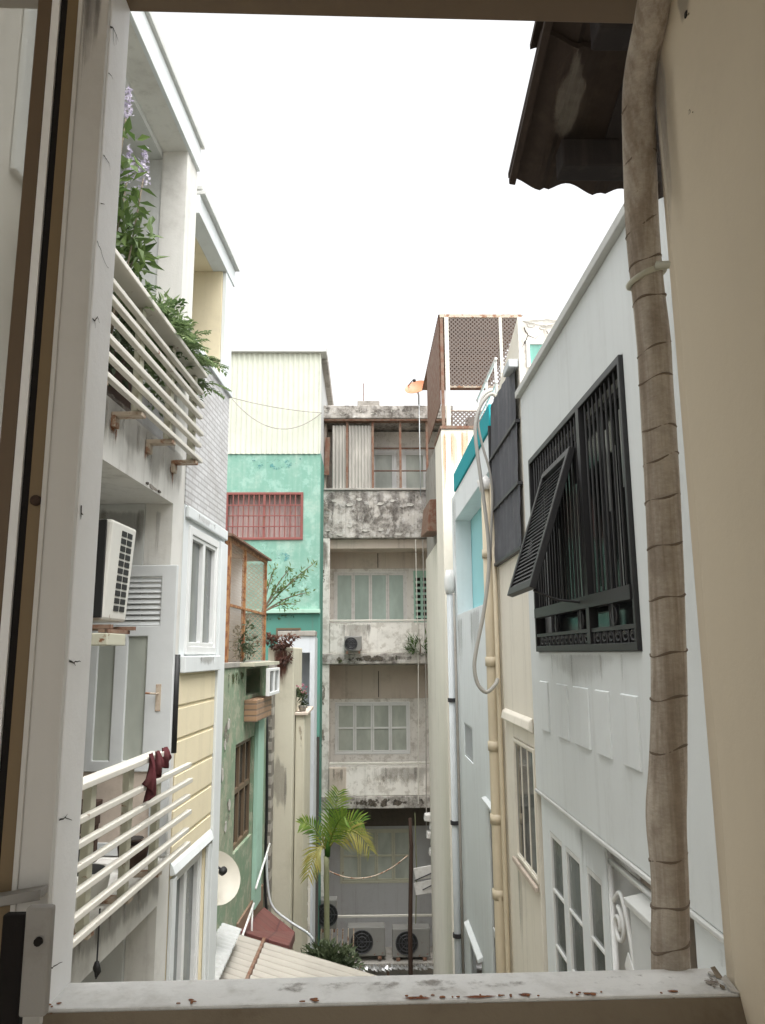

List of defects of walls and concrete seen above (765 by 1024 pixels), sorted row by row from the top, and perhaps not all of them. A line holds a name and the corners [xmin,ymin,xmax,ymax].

leakage [352,505,402,525]